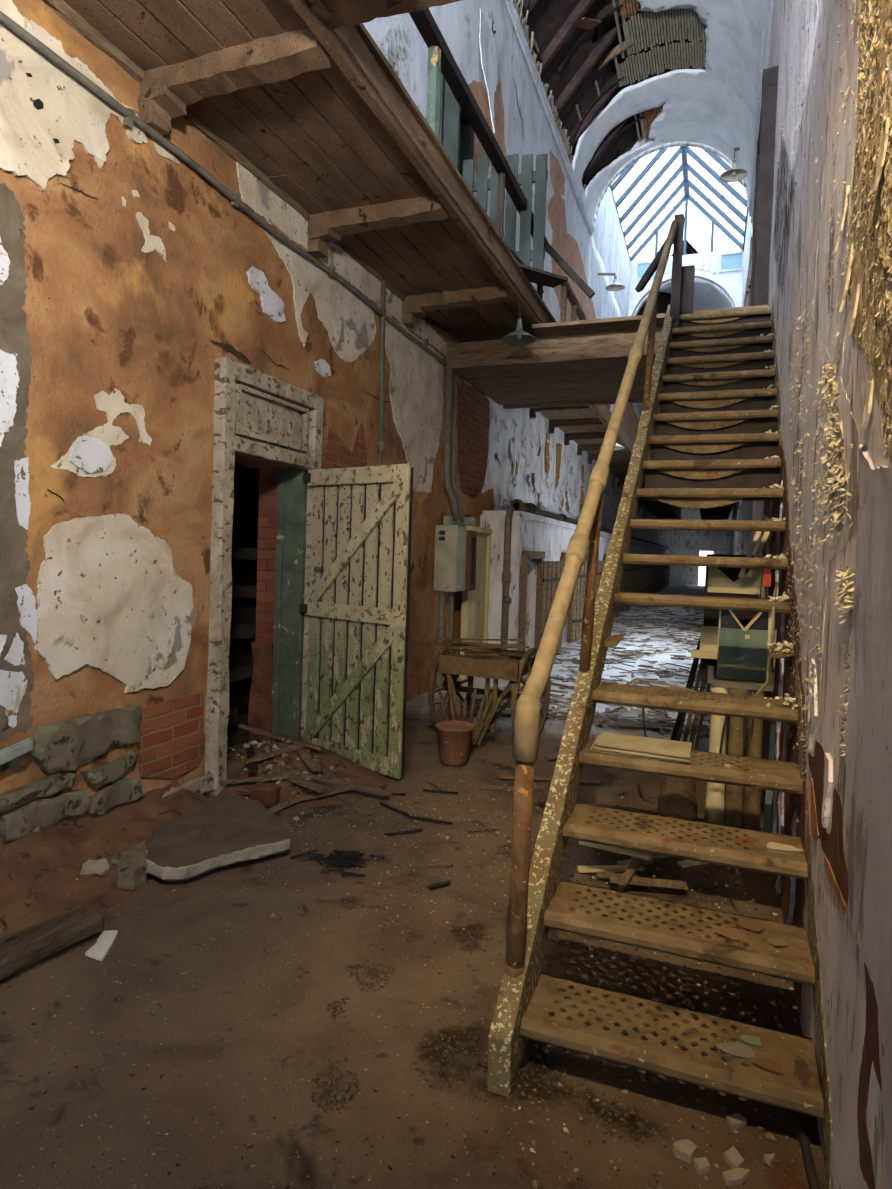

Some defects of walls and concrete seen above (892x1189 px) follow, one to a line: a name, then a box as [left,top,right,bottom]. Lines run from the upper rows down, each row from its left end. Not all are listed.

peeling [0,0,214,798]
peeling [236,162,447,493]
flaking render [456,383,590,520]
peeling [547,150,596,321]
peeling [760,0,892,1189]